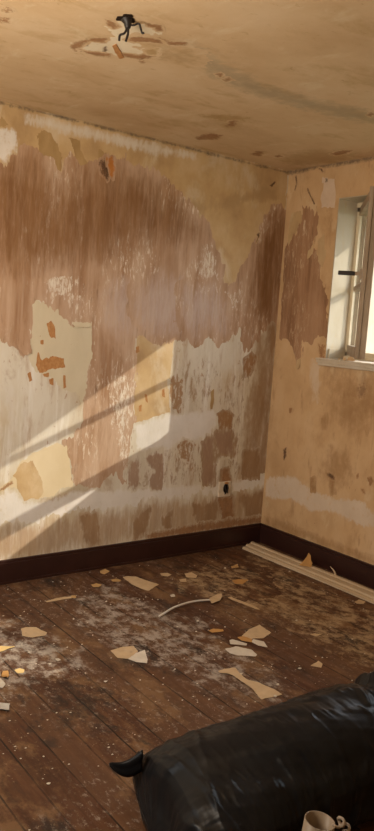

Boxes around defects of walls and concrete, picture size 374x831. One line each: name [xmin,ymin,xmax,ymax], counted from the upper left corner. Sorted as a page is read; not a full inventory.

peeling [67,18,190,64]
peeling [37,130,62,171]
peeling [16,274,95,405]
peeling [126,240,248,348]
peeling [105,366,148,470]
peeling [0,461,44,501]